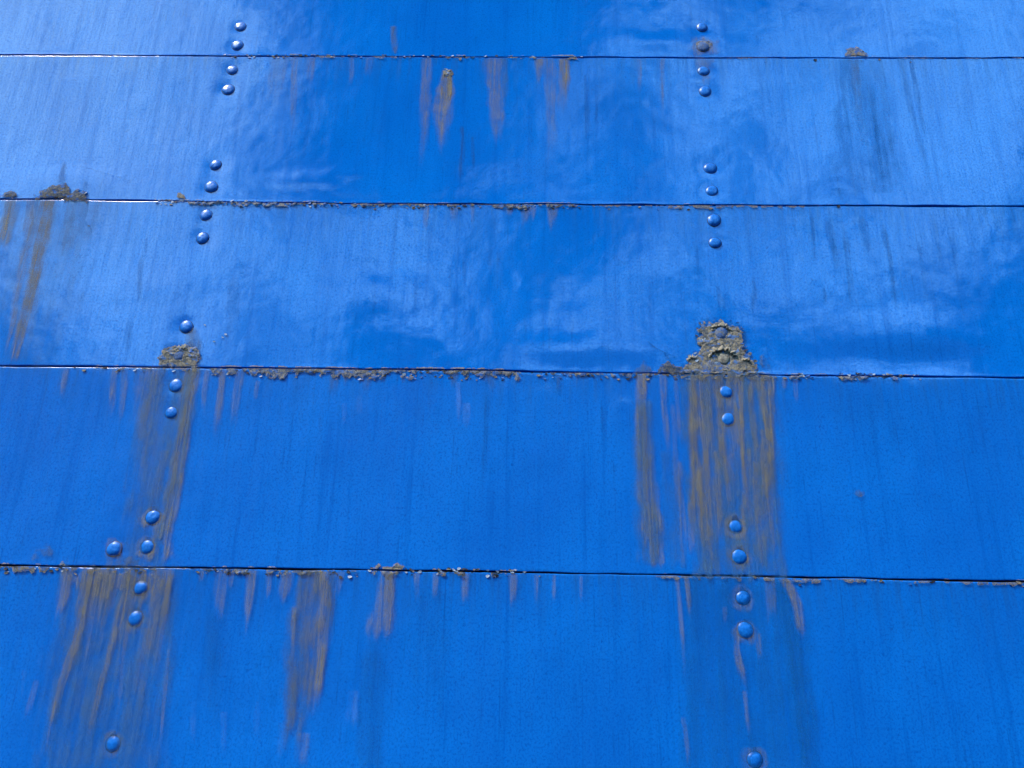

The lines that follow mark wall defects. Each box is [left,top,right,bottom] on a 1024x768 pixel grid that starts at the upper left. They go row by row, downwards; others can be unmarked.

rust [439,68,453,131]
rust [153,369,197,557]
rust [682,376,779,577]
rust [287,572,327,726]